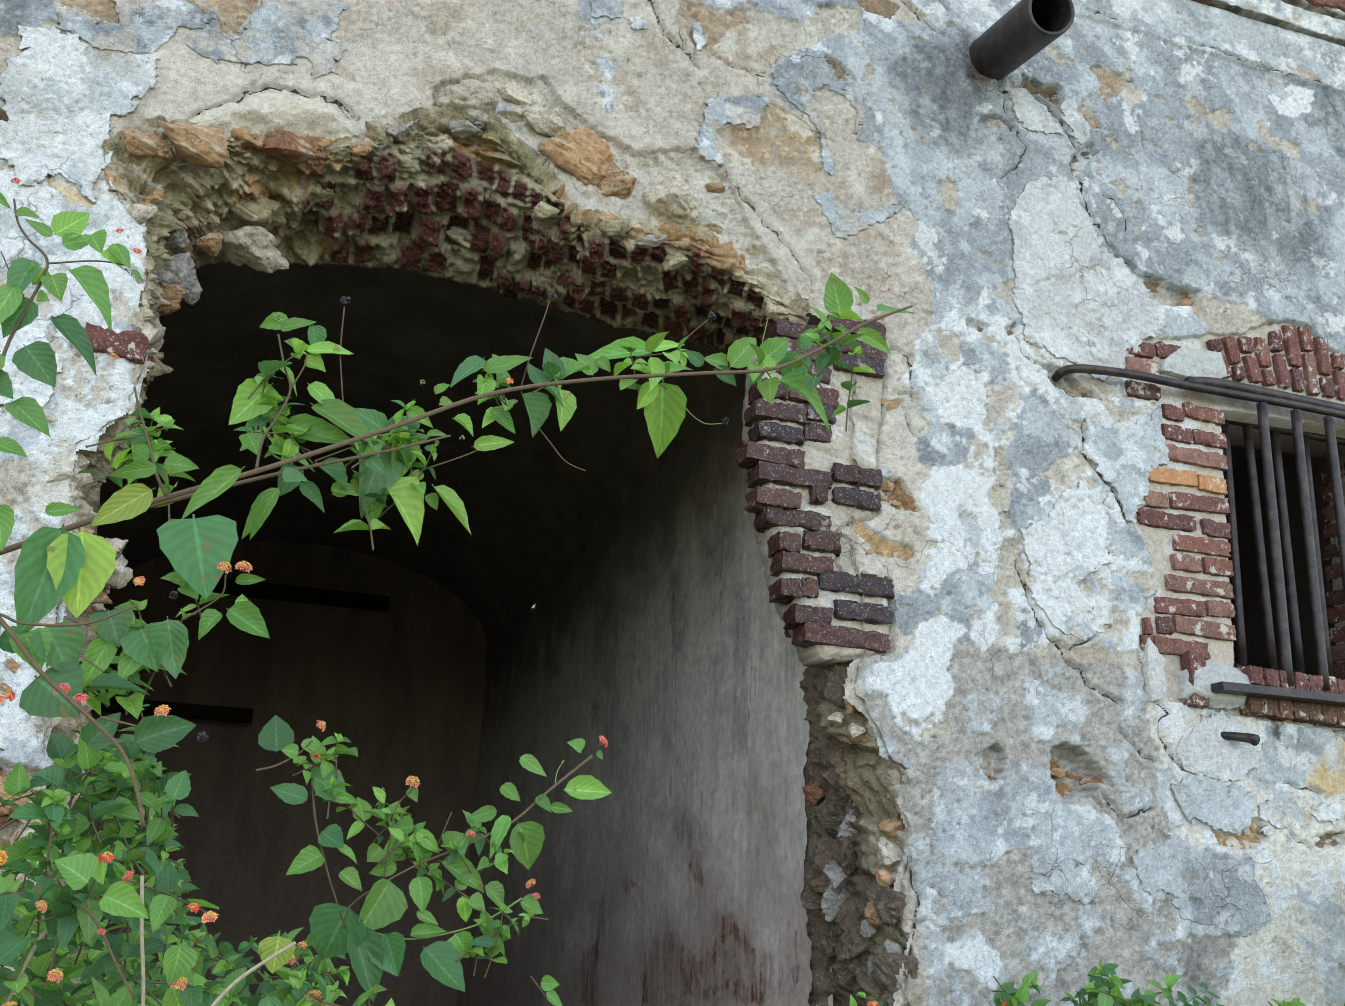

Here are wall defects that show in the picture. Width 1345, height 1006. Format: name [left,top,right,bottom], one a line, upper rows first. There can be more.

crack [1189,43,1327,84]
crack [997,82,1027,177]
crack [1048,111,1152,283]
spalling [0,0,917,665]
spalling [0,659,21,692]
crack [1014,563,1185,771]
spalling [0,763,66,920]
spalling [41,702,93,763]
spalling [799,621,919,1006]
spalling [1050,748,1104,797]
crack [1100,791,1151,818]